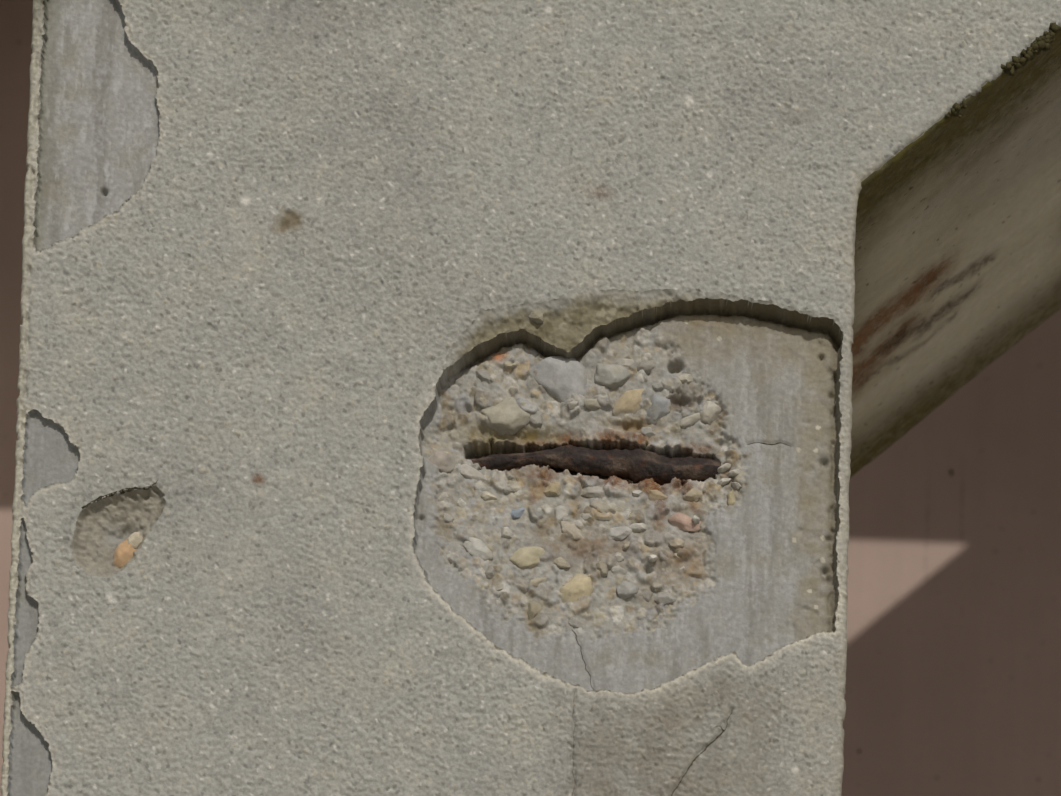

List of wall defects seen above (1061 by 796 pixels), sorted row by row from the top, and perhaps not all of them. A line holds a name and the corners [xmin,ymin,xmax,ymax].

peeling [33,0,160,252]
corrosion [851,264,946,383]
peeling [21,409,80,505]
spalling [70,485,166,578]
spalling [412,289,844,693]
peeling [7,518,52,796]
crack [671,713,732,796]